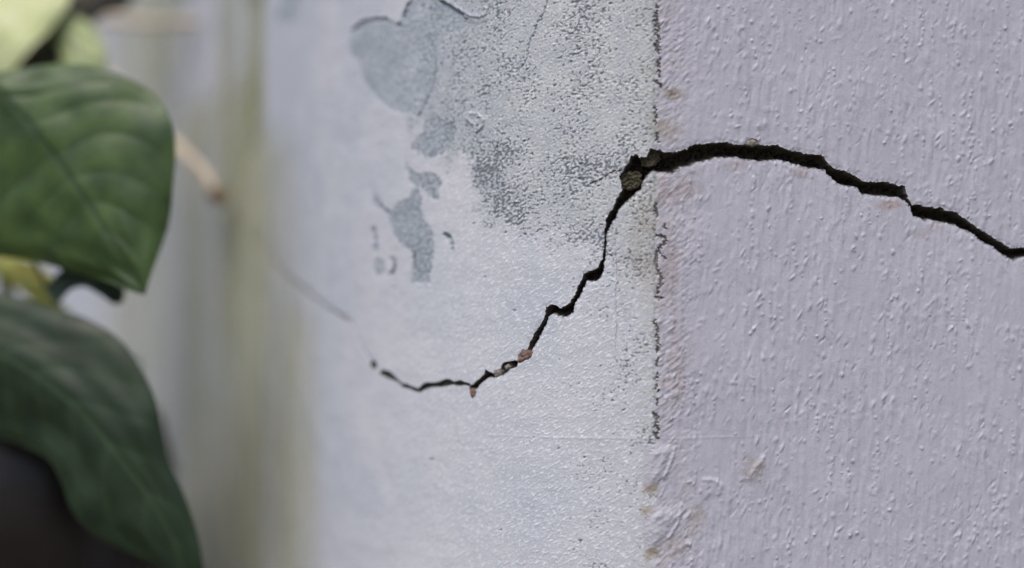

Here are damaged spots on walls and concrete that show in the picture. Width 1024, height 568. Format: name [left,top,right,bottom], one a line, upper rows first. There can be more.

peeling [349,0,489,285]
crack [266,0,1024,441]